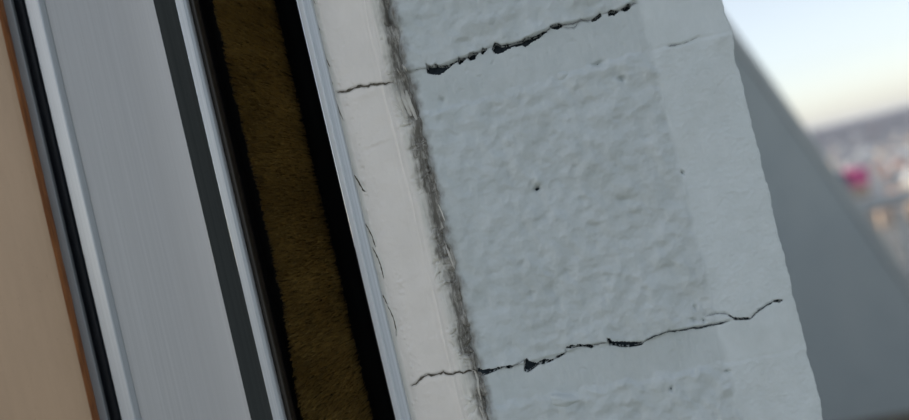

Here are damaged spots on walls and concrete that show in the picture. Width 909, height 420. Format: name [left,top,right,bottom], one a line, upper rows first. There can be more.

crack [416,3,636,75]
crack [337,82,393,93]
crack [412,299,782,386]